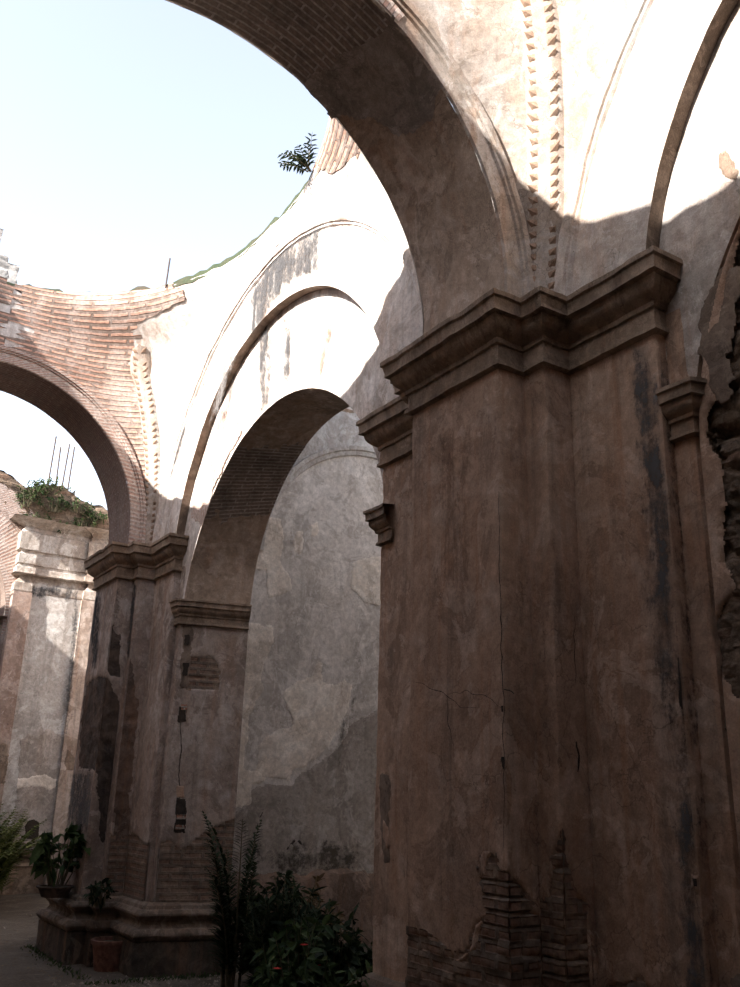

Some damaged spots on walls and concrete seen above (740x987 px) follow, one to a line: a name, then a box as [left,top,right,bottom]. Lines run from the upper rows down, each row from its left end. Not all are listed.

leakage [213,229,320,412]
crack [416,498,514,803]
leakage [633,350,697,767]
flaking render [0,743,57,790]
crack [176,722,184,786]
flaking render [78,623,352,902]
flaking render [405,851,541,987]
leakage [676,783,712,987]